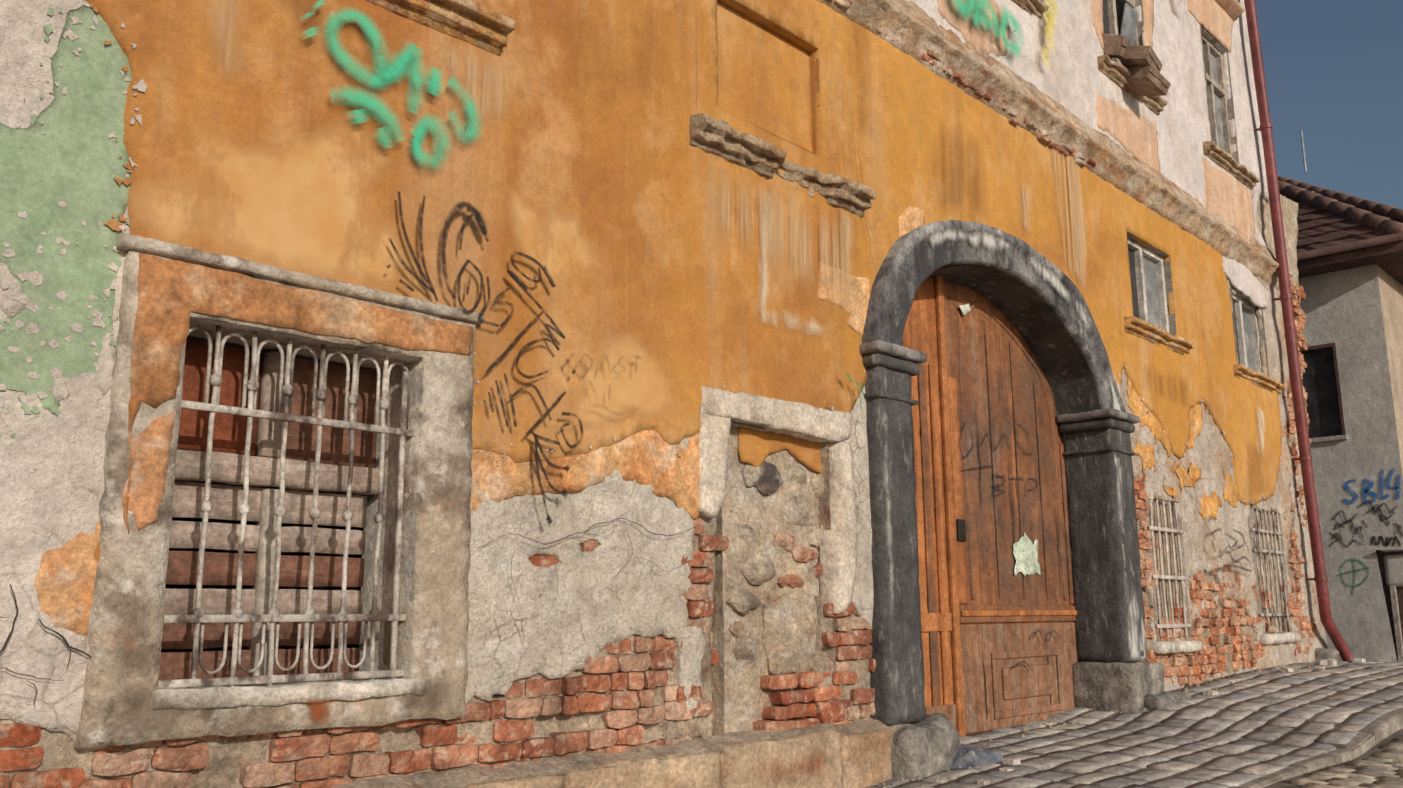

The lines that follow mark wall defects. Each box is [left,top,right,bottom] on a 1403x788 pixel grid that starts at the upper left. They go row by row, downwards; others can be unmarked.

crack [0,584,92,706]
flaking render [0,0,729,788]
flaking render [808,370,876,723]
flaking render [1119,195,1328,691]